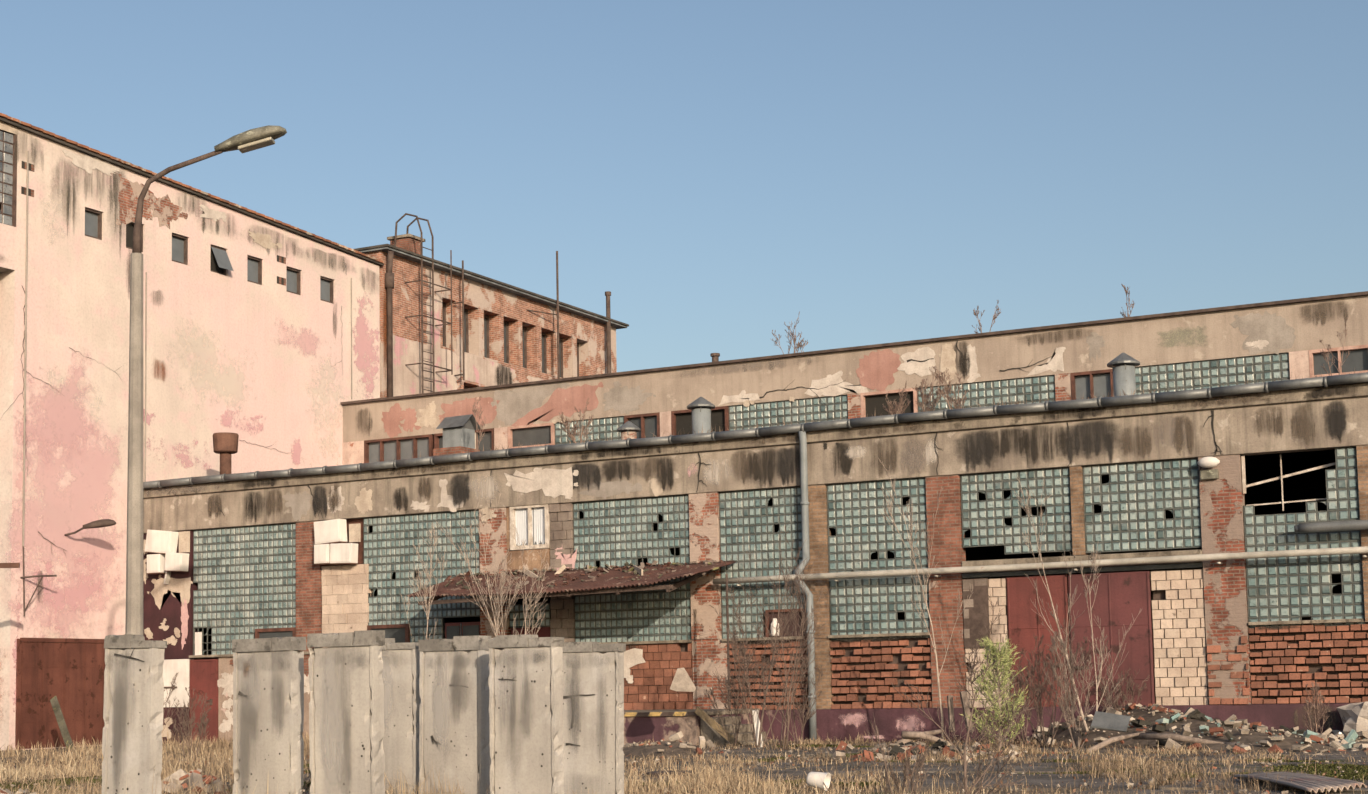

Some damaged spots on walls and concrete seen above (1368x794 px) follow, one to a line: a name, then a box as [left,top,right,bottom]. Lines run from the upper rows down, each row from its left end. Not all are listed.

peeling [785,343,981,402]
crack [907,341,968,374]
crack [1000,356,1052,372]
peeling [1027,347,1066,376]
peeling [718,390,765,407]
leakage [835,424,937,475]
leakage [958,386,1349,471]
leakage [244,479,282,522]
leakage [313,486,338,517]
peeling [143,539,193,649]
peeling [624,648,645,684]
peeling [217,660,233,733]